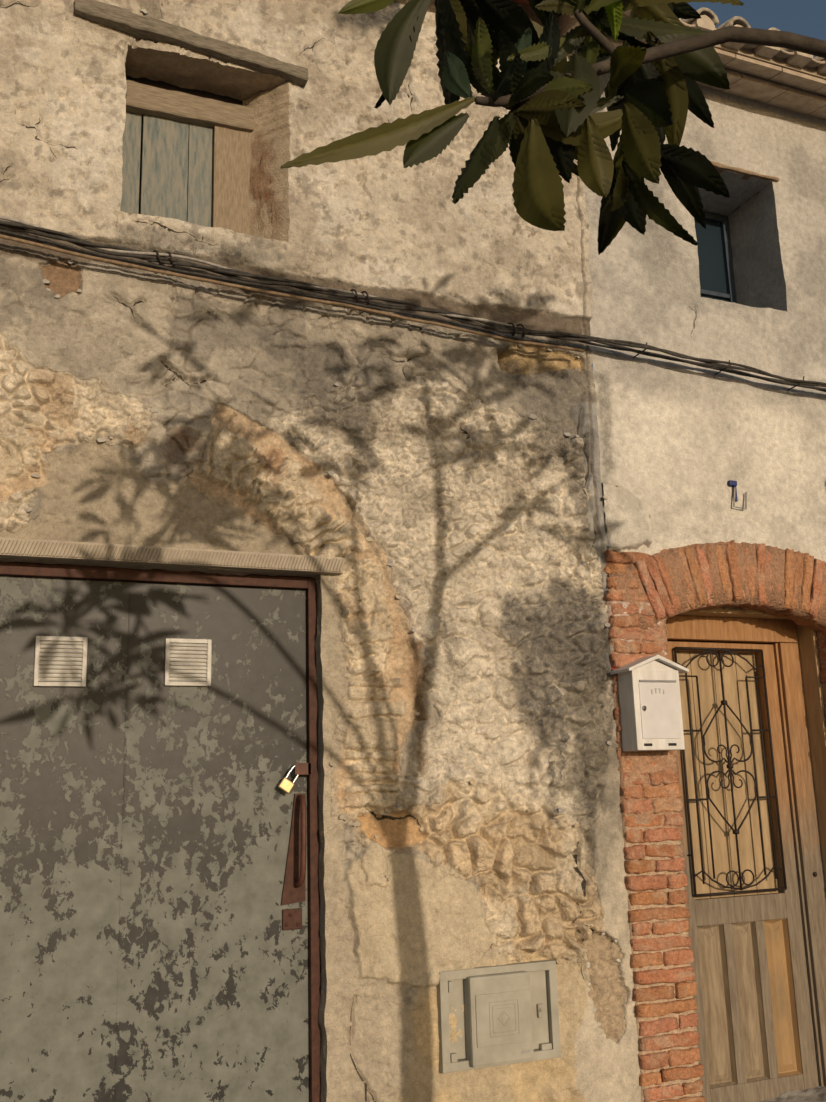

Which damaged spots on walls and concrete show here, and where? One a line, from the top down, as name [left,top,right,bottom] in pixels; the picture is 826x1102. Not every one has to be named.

damp [336,0,401,32]
crack [20,118,77,157]
spalling [39,259,83,299]
crack [161,361,208,389]
spalling [497,344,584,375]
spalling [0,332,160,534]
crack [350,999,376,1102]